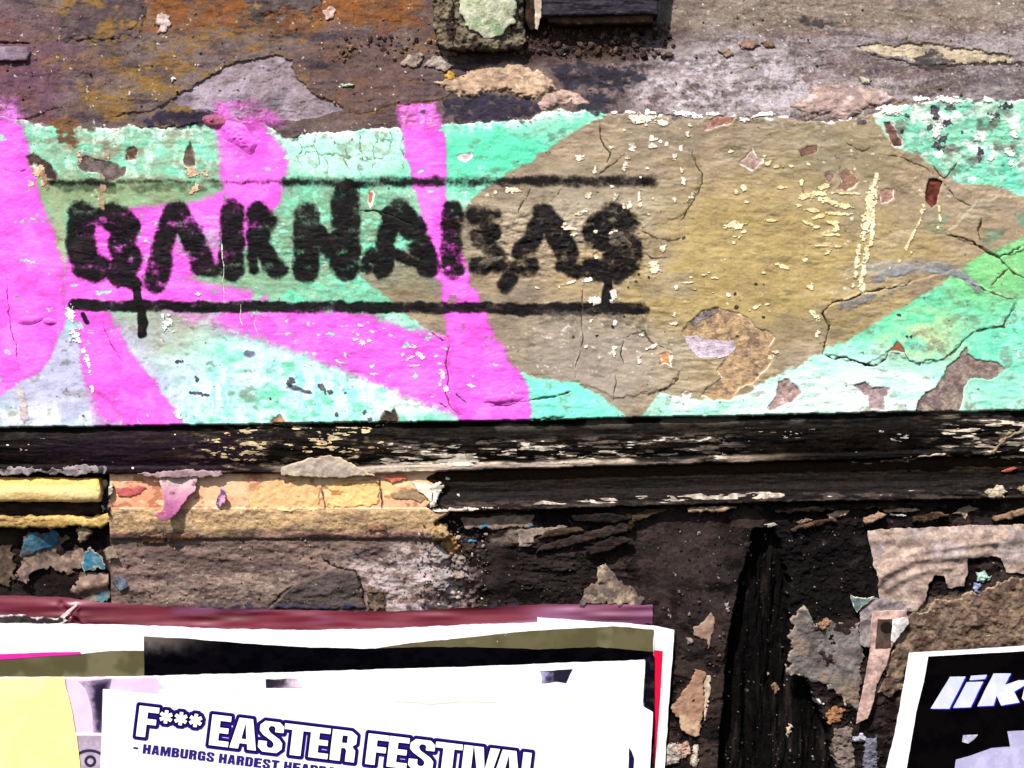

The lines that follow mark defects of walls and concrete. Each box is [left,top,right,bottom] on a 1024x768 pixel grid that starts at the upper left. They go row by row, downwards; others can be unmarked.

spalling [171,55,343,121]
peeling [77,146,138,181]
spalling [611,83,1019,202]
peeling [587,244,667,305]
crack [821,133,1024,366]
spalling [669,292,779,401]
spalling [854,382,891,410]
spalling [915,347,1005,412]
peeling [0,409,730,521]
peeling [635,492,785,503]
peeling [931,419,1024,463]
flaking render [693,613,715,648]